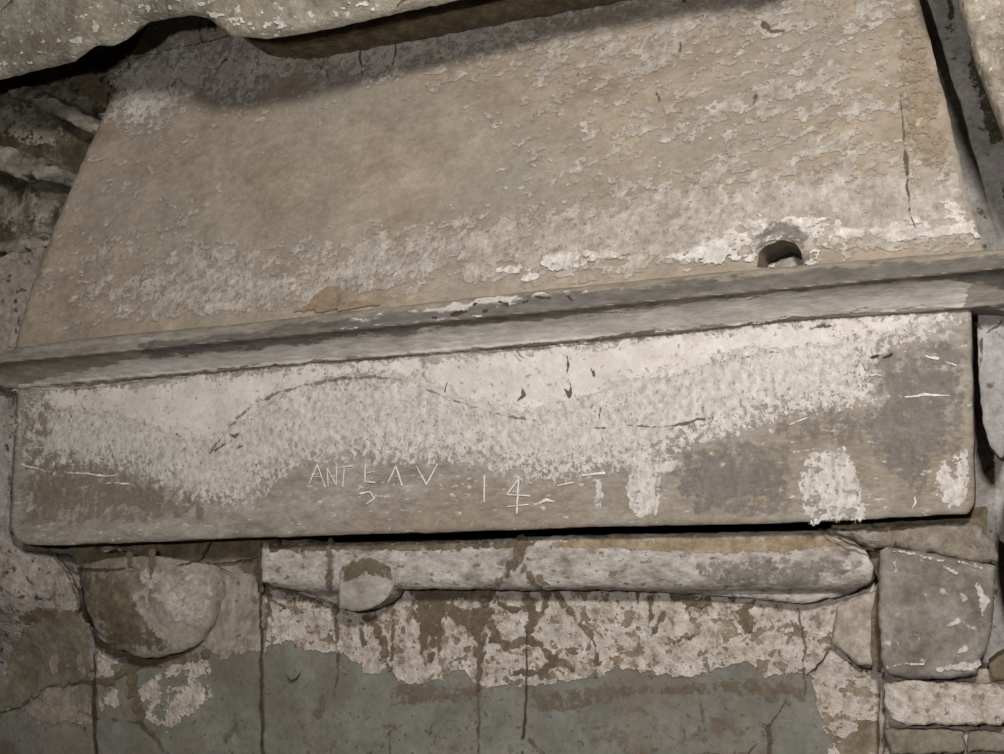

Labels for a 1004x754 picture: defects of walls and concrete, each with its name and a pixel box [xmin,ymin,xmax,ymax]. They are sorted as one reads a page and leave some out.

crack [118,18,230,69]
mould [968,61,1003,144]
crack [176,542,231,573]
crack [52,553,133,754]
crack [136,719,169,754]
crack [256,537,281,754]
crack [474,682,482,752]
peeling [129,557,881,754]
crack [521,621,545,754]
crack [700,608,887,754]